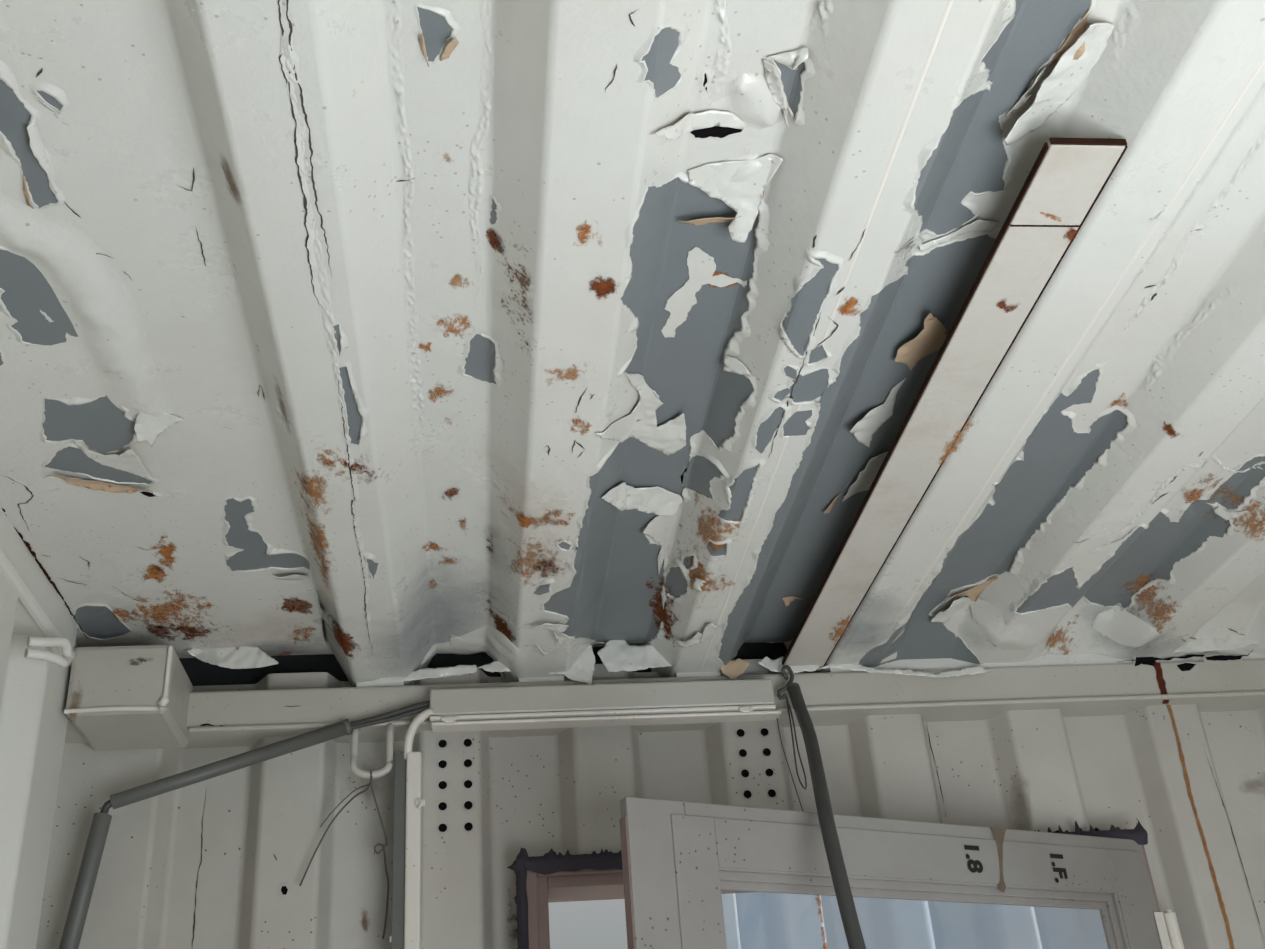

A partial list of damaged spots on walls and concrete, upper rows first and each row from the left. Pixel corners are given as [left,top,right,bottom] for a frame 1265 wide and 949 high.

peeling [0,60,70,210]
crack [278,0,332,311]
peeling [0,246,78,347]
crack [0,472,139,639]
peeling [39,395,185,499]
rust [112,536,216,641]
crack [338,373,377,655]
rust [590,277,616,299]
peeling [532,0,1158,667]
rust [782,137,1128,670]
peeling [1009,454,1265,615]
rust [1154,663,1234,949]